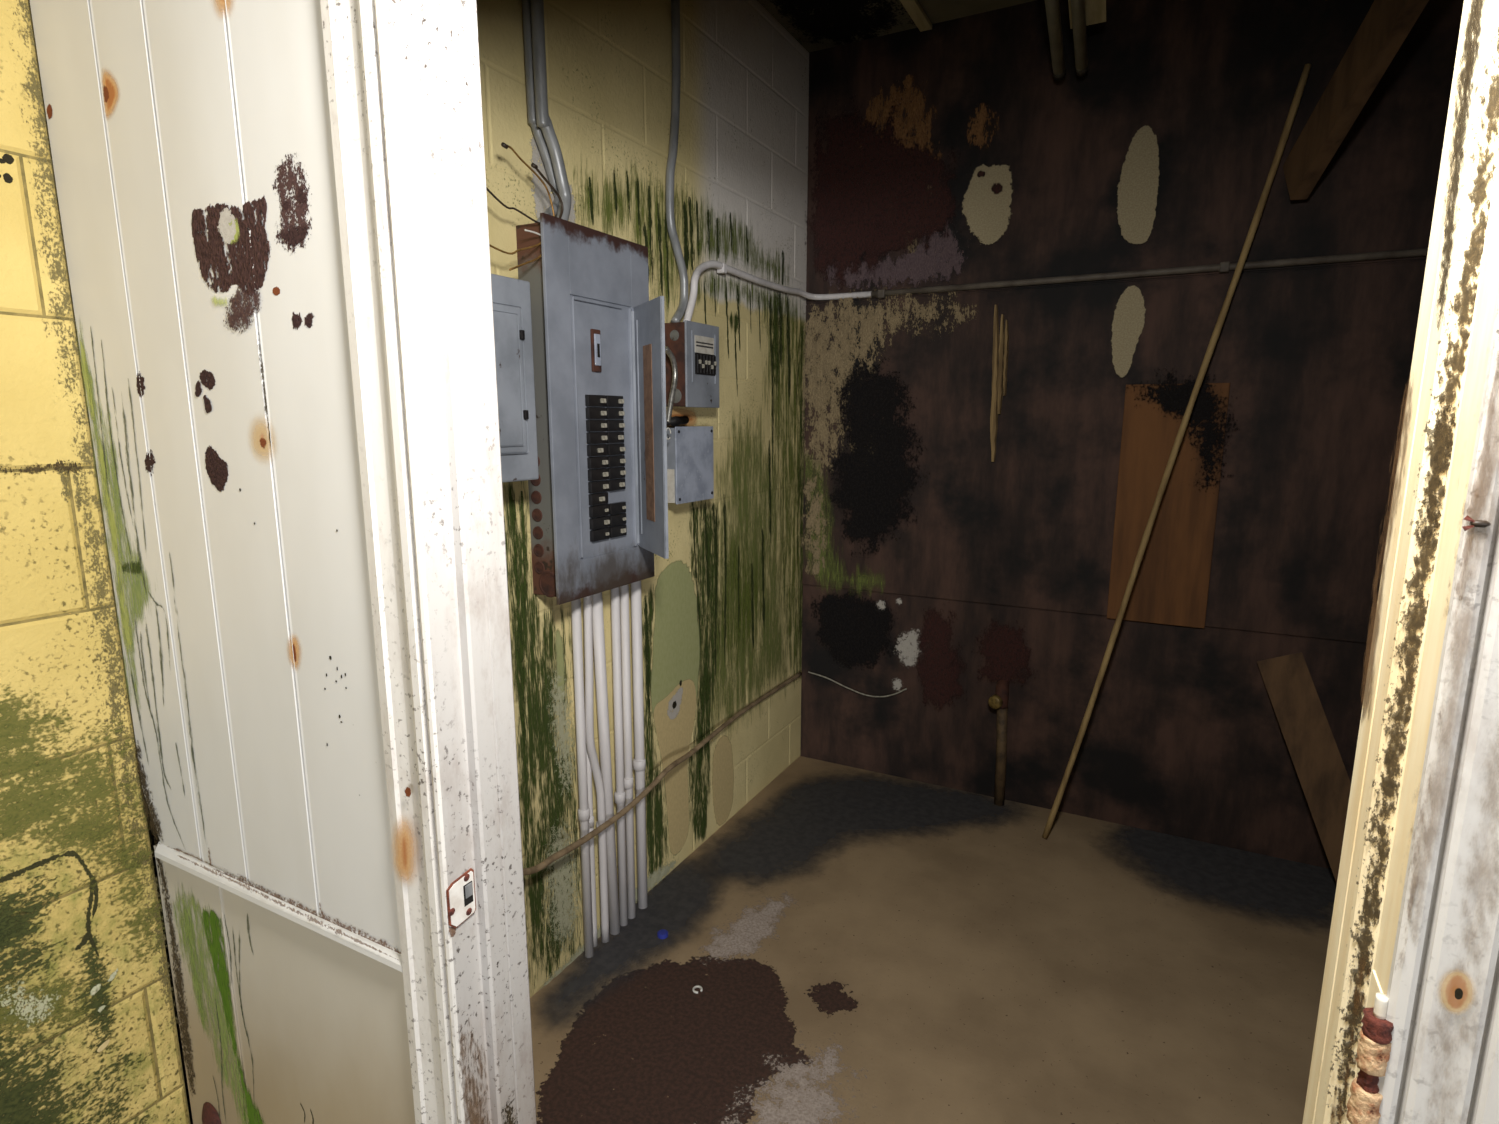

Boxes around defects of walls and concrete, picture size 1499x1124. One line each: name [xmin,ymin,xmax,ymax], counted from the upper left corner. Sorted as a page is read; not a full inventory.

corrosion [103,72,118,116]
peeling [191,153,312,334]
peeling [802,103,1013,483]
peeling [1117,125,1160,244]
damp [0,0,197,1096]
corrosion [254,425,271,454]
corrosion [289,638,299,667]
damp [613,170,791,781]
damp [1327,0,1499,1124]
damp [536,775,1016,1124]
damp [1111,826,1337,927]
corrosion [1442,972,1472,1012]